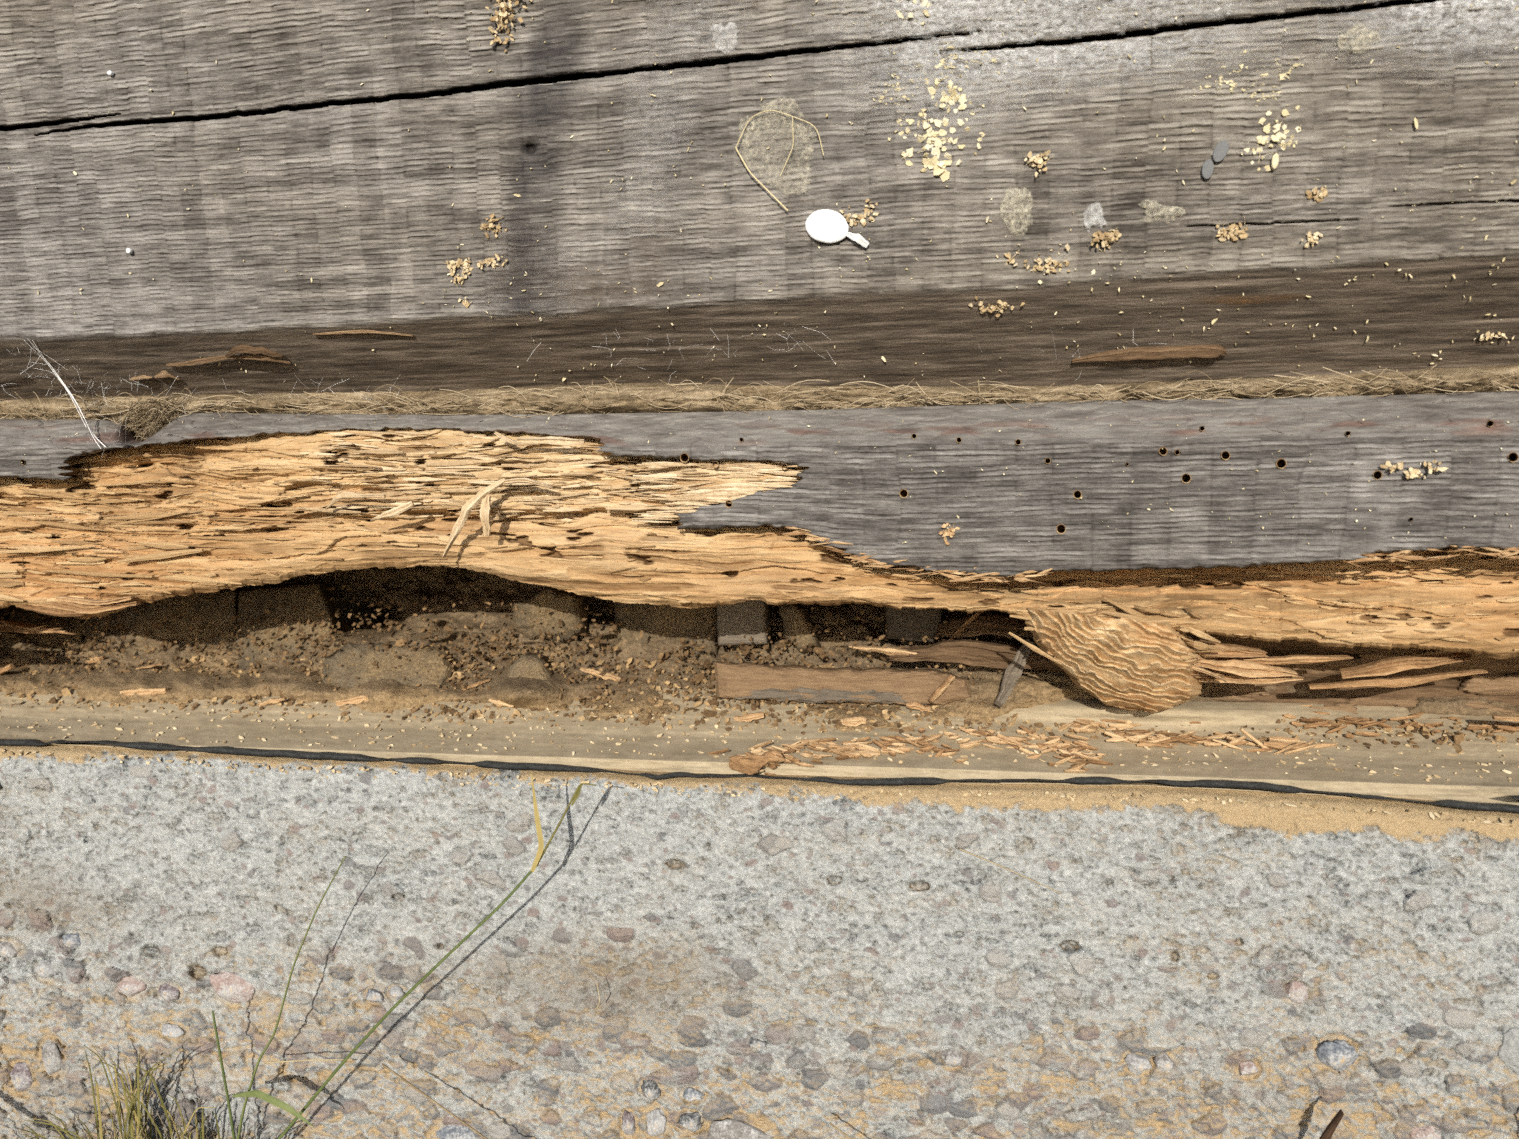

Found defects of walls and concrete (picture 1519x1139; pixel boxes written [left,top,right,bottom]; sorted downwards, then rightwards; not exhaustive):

crack [0,0,1442,136]
peeling [21,595,141,617]
peeling [1191,639,1488,689]